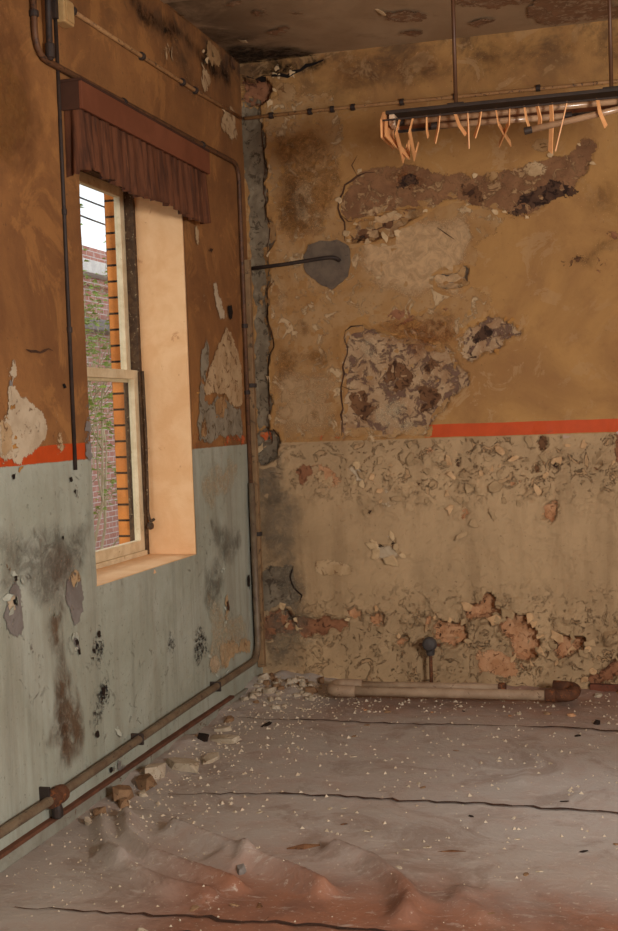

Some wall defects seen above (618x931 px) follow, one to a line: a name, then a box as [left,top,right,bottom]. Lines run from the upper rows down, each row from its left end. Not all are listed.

water stain [201,51,229,83]
peeling [201,40,236,92]
flaking render [221,76,597,465]
peeling [2,564,25,637]
spalling [425,587,618,683]
corrosion [58,673,83,763]
water stain [93,681,109,738]
crack [184,792,618,814]
crack [15,906,412,931]